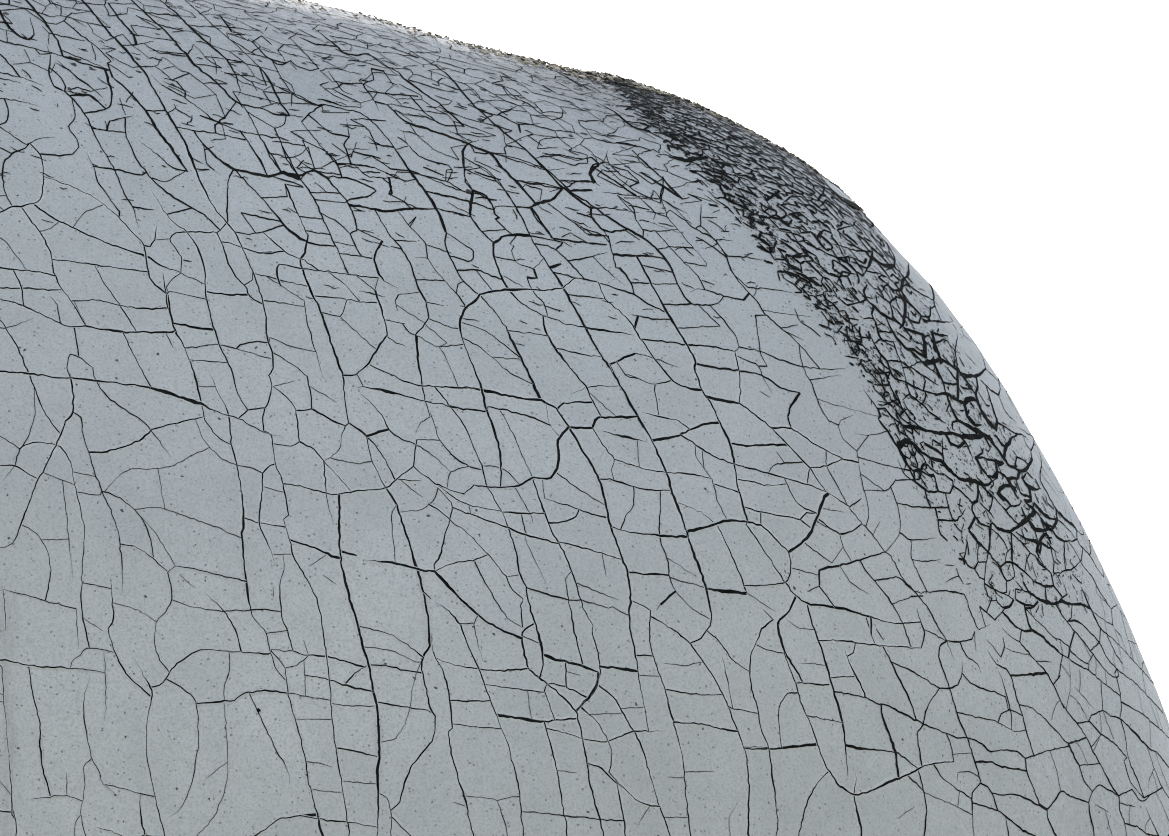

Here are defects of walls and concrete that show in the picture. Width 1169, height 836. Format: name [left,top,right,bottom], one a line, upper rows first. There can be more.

crack [0,54,44,86]
crack [0,98,34,125]
crack [1105,618,1155,685]
crack [197,718,228,836]